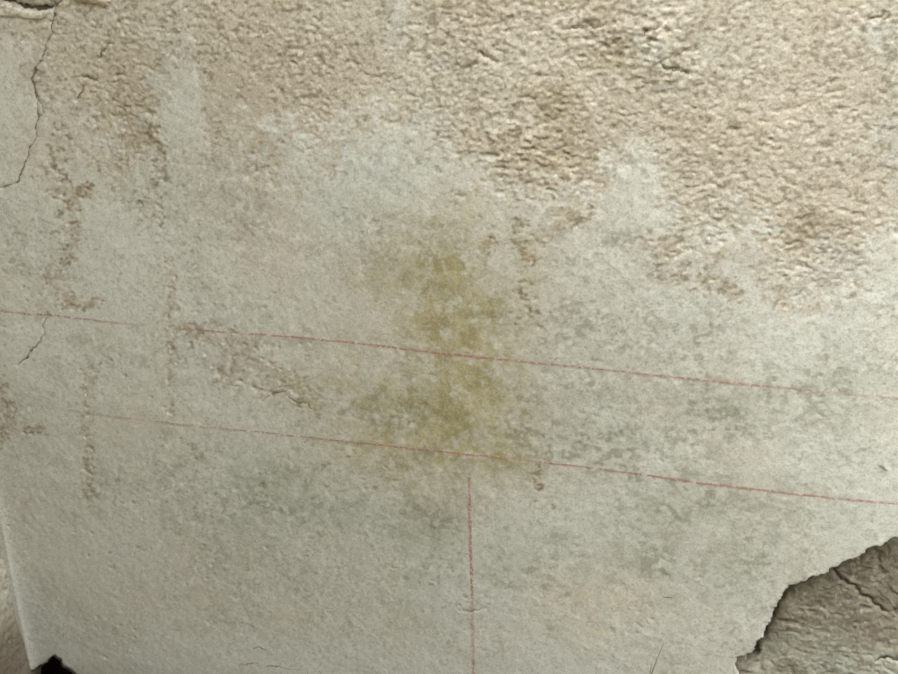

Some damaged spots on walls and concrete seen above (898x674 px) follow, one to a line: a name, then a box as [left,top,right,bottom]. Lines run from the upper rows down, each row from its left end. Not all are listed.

crack [0,0,61,188]
water stain [154,16,898,664]
flaking render [735,537,898,674]